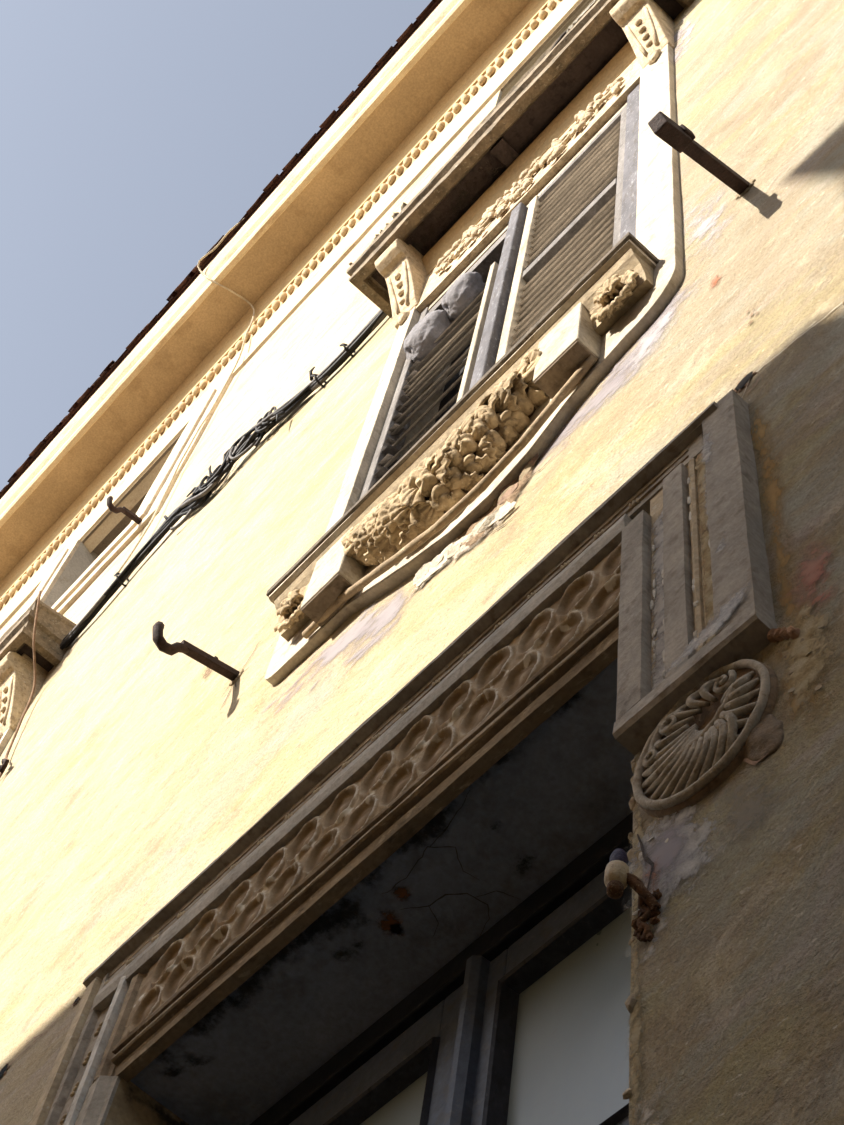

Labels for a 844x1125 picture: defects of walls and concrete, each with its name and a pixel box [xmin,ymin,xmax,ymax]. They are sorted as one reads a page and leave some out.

spalling [412,454,551,591]
peeling [767,605,839,706]
water stain [184,899,365,1035]
crack [382,790,521,936]
corrosion [631,889,662,942]
peeling [622,758,716,1125]